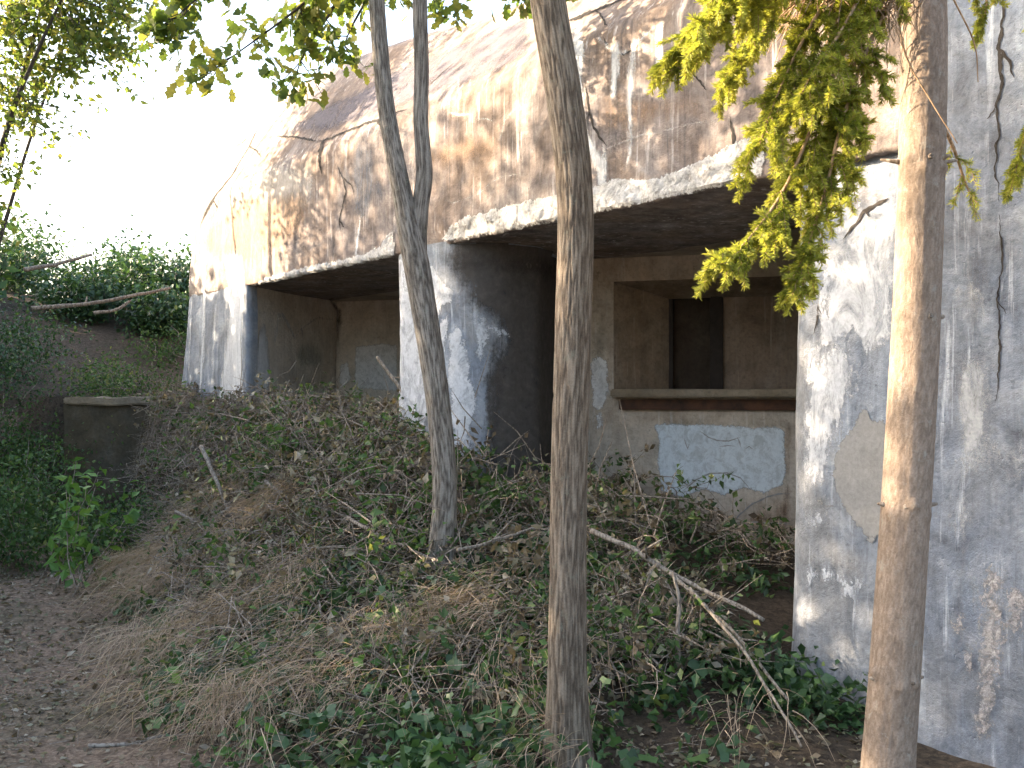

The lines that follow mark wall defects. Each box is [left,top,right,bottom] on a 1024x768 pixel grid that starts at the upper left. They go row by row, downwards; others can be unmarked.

crack [199,109,406,230]
crack [843,198,888,239]
crack [987,0,1014,401]
leakage [451,236,557,504]
peeling [805,409,886,543]